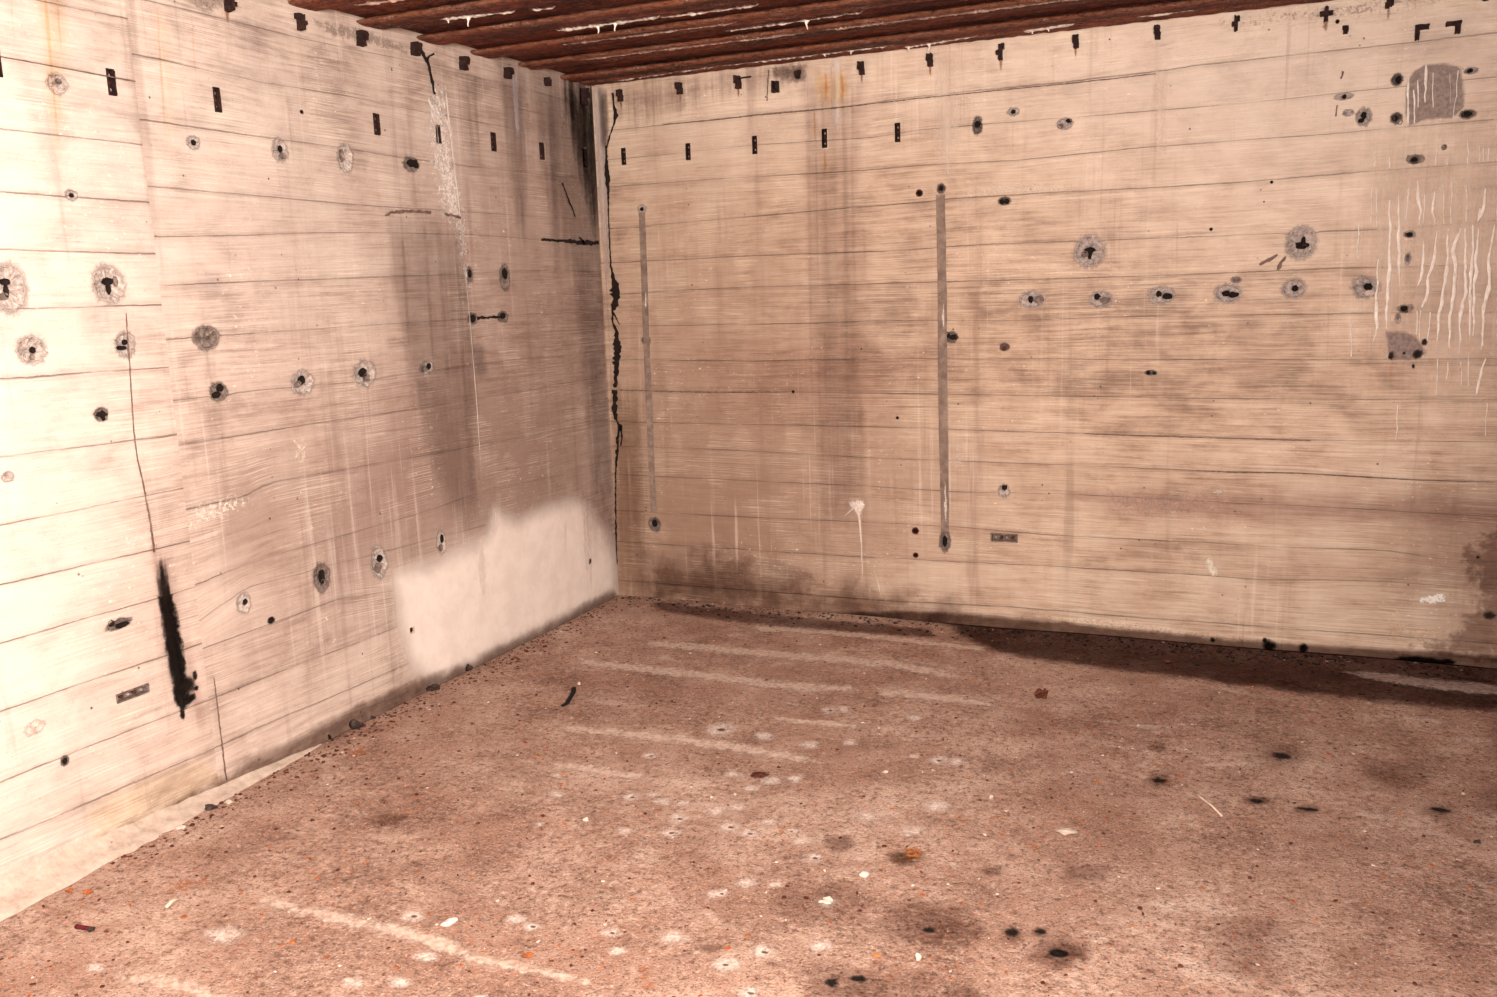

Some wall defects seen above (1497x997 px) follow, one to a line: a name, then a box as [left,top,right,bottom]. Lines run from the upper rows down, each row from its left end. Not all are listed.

water stain [441,11,514,27]
water stain [557,0,1078,60]
water stain [425,81,480,449]
crack [541,93,790,562]
water stain [842,498,1497,694]